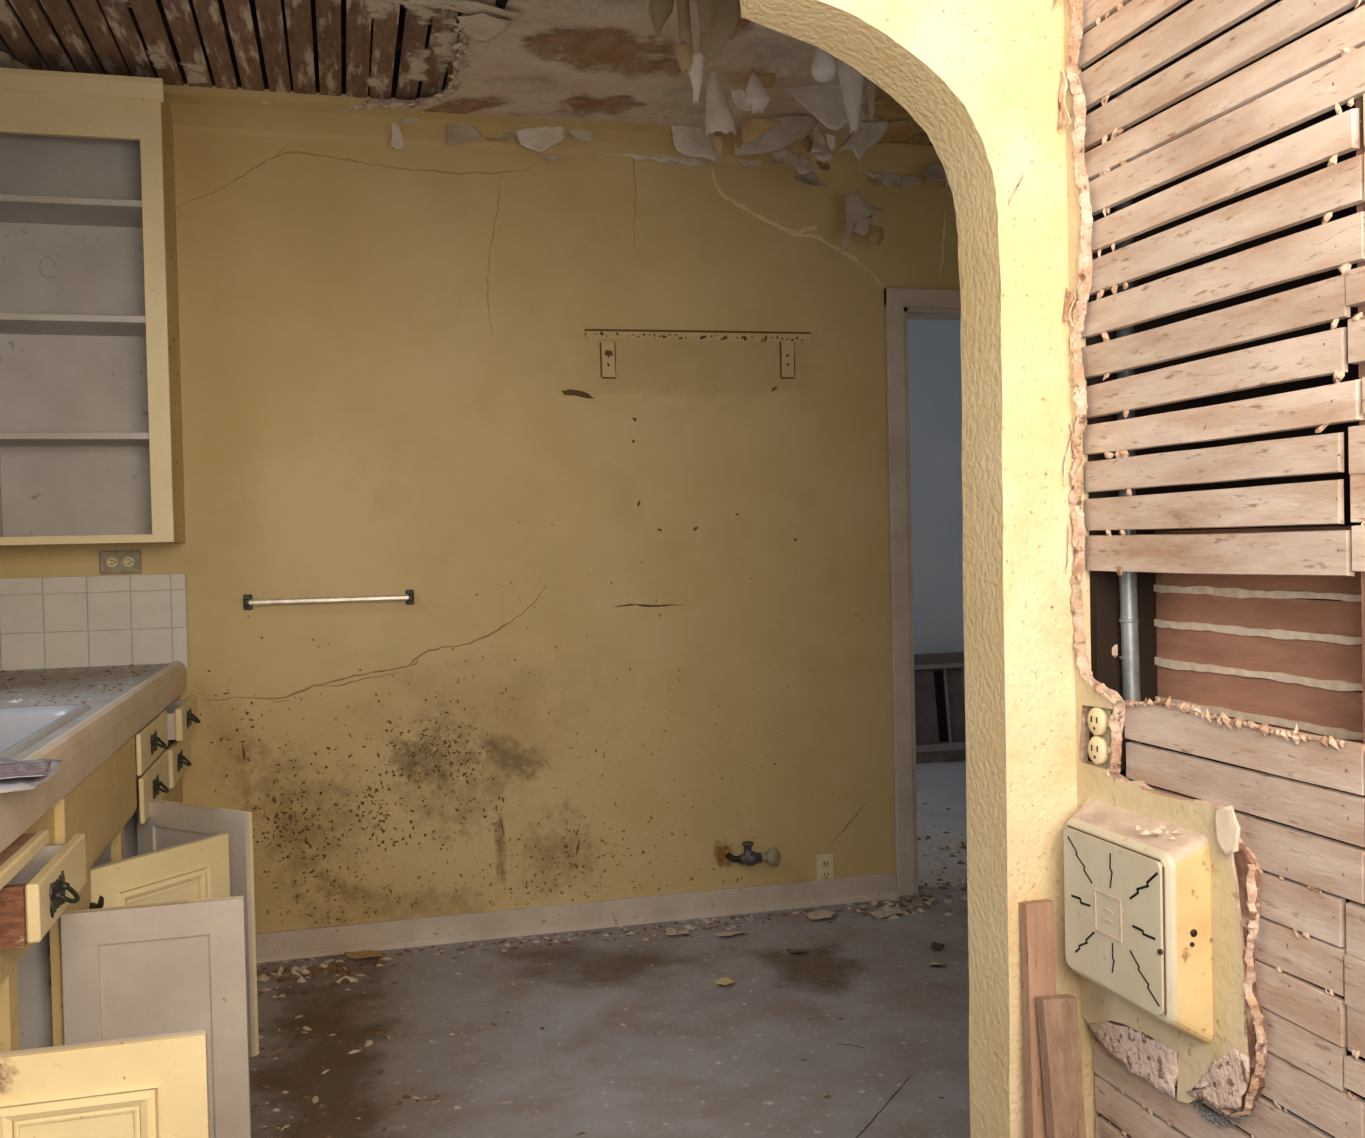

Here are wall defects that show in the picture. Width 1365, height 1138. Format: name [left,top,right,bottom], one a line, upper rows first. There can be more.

flaking render [0,0,474,150]
peeling [446,124,719,167]
damp [566,95,643,114]
damp [524,0,688,74]
damp [730,0,751,39]
peeling [730,58,888,161]
crack [177,145,539,327]
crack [712,167,884,287]
crack [220,586,546,703]
crack [615,601,679,609]
flaking render [1052,0,1365,1138]
damp [200,643,754,924]